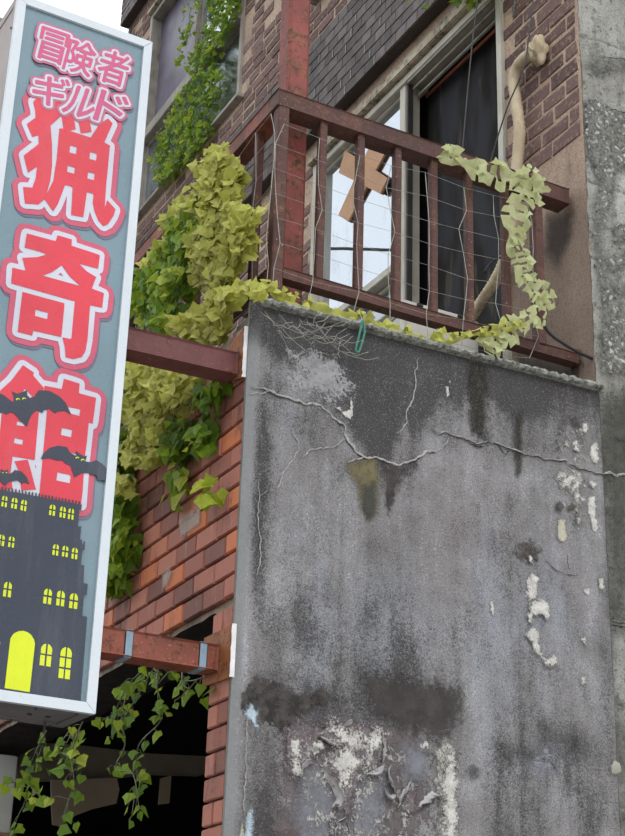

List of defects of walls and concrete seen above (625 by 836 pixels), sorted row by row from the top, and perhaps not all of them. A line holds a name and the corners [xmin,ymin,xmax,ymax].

crack [400,359,418,434]
damp [466,362,489,445]
damp [348,459,418,519]
crack [248,386,625,575]
damp [513,413,524,477]
spalling [554,416,601,542]
damp [241,675,338,732]
damp [358,668,465,741]
peeling [265,704,466,836]
damp [244,809,254,836]